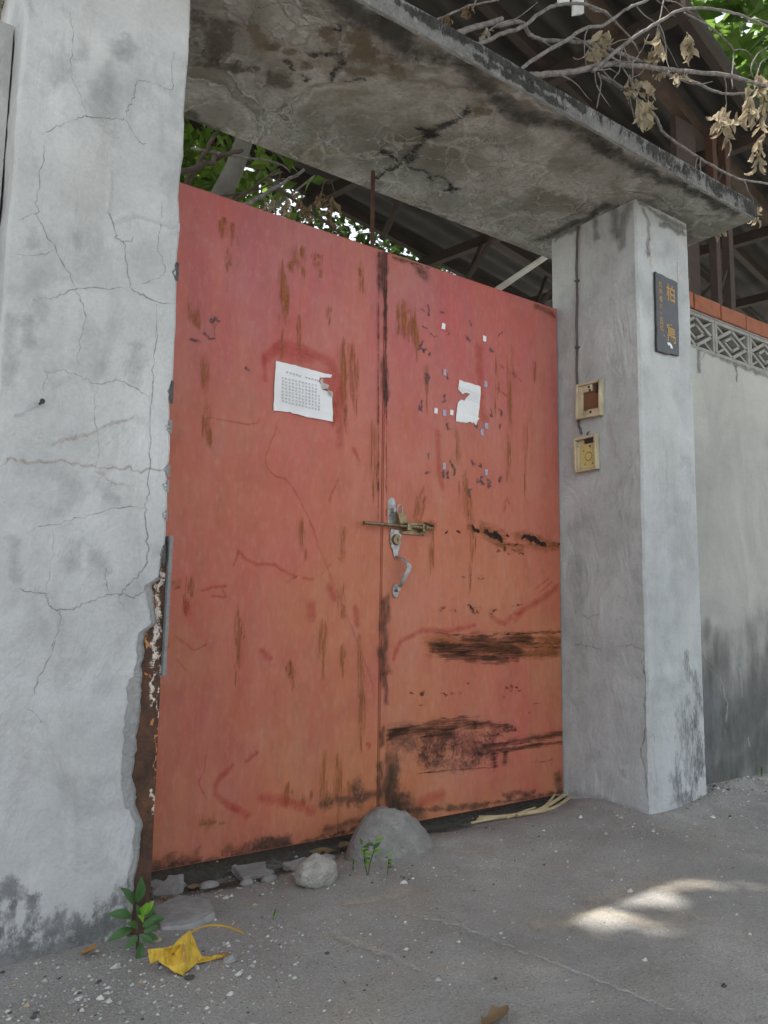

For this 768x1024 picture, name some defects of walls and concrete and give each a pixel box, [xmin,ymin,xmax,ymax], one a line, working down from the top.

water stain [309,52,366,82]
water stain [330,0,441,61]
water stain [370,107,470,192]
water stain [455,58,738,248]
corrosion [281,248,305,313]
corrosion [332,345,359,423]
corrosion [430,632,558,662]
spalling [0,536,174,948]
corrosion [389,716,563,768]
water stain [702,643,768,784]